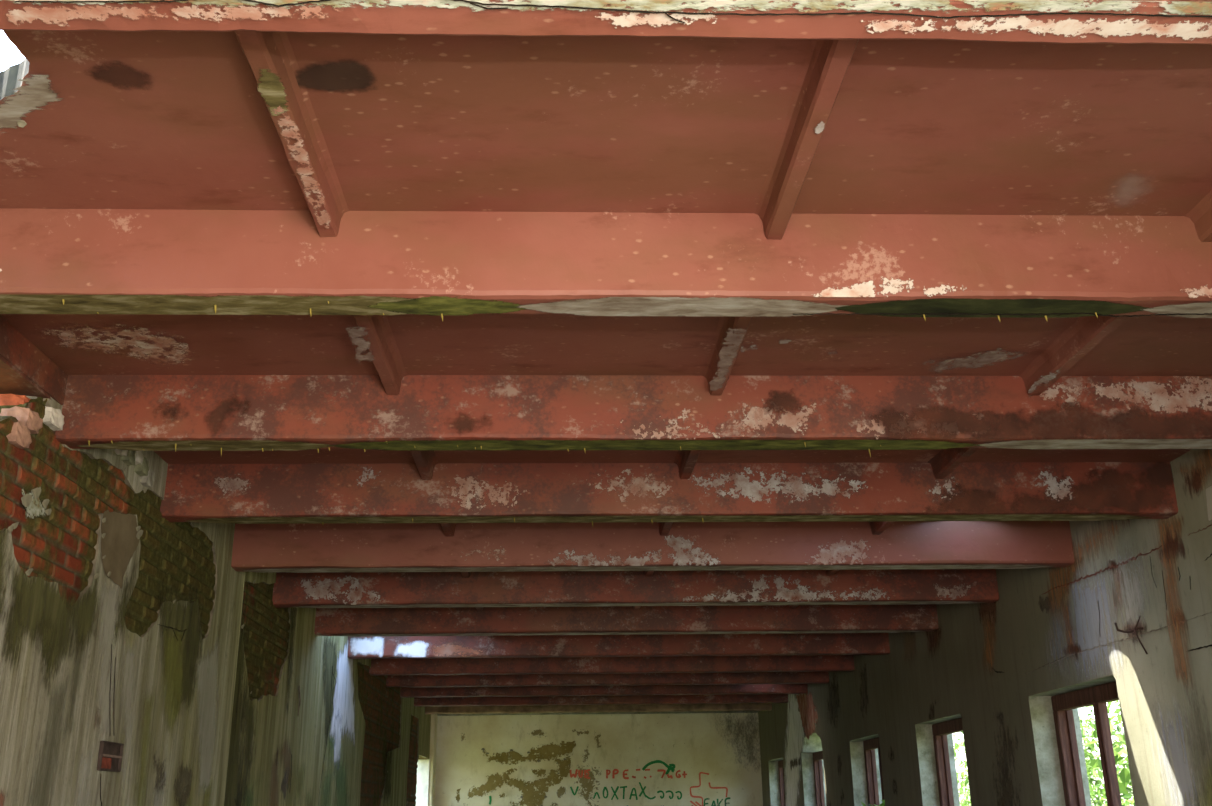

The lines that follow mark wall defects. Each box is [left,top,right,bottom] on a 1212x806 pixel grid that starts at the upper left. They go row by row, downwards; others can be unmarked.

peeling [595,11,716,28]
peeling [861,15,1212,41]
water stain [296,61,374,92]
rust [452,414,486,433]
rust [766,391,798,413]
peeling [1028,370,1212,414]
water stain [21,487,52,519]
spalling [0,394,216,641]
rust [875,402,1212,680]
water stain [96,585,218,806]
water stain [29,643,85,806]
peeling [455,729,601,806]